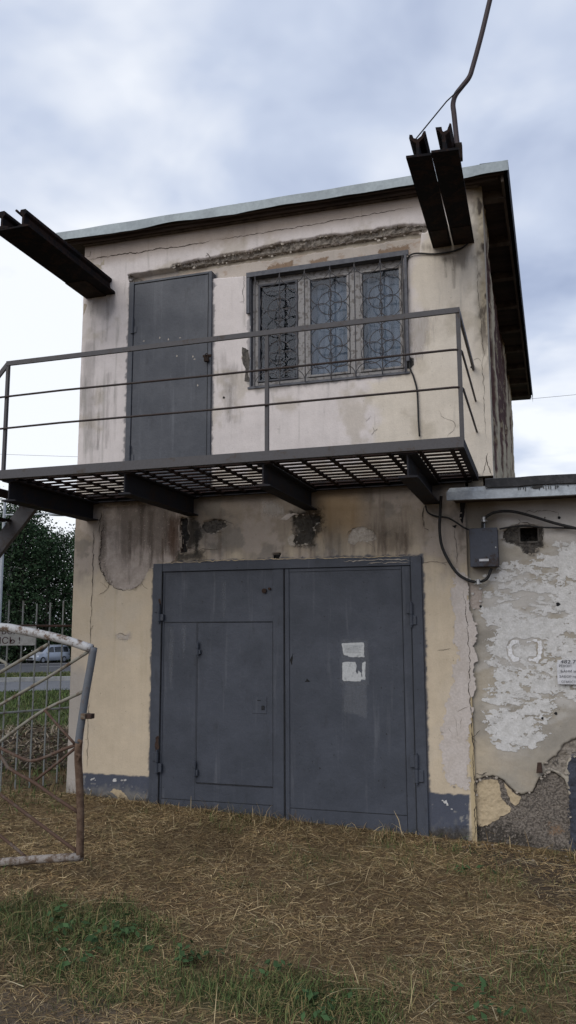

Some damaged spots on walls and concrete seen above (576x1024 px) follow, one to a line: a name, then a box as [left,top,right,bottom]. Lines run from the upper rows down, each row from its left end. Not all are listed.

spalling [170,225,427,271]
peeling [168,513,411,564]
peeling [439,517,576,852]